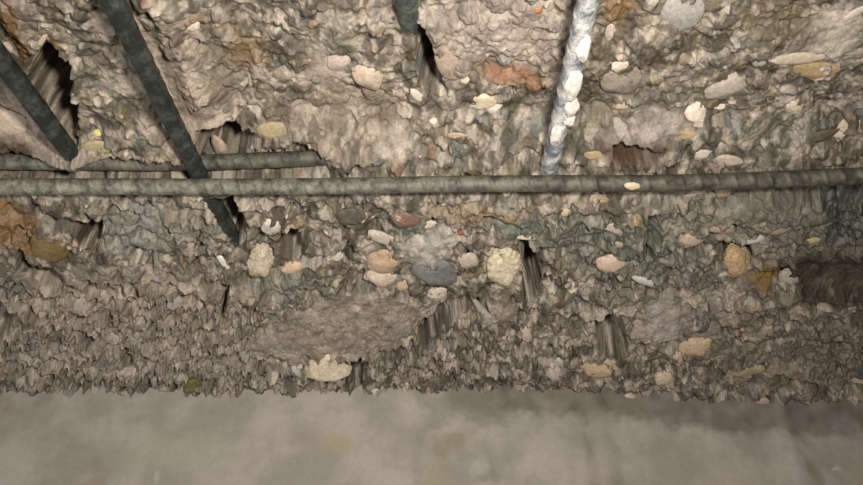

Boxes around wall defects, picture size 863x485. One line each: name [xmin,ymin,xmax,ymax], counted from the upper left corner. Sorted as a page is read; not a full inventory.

spalling [0,0,863,179]
spalling [0,167,863,430]